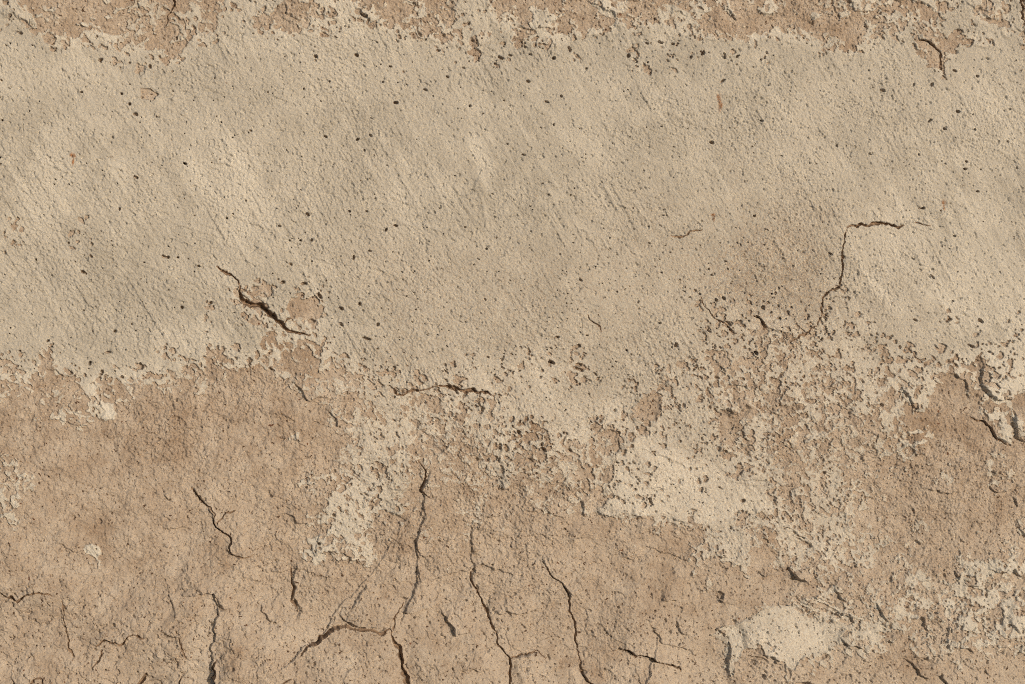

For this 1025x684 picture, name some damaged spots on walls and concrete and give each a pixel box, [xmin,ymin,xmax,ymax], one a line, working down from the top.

peeling [0,0,1025,81]
crack [216,266,311,336]
crack [790,222,931,342]
crack [393,385,494,397]
peeling [0,266,1025,684]
crack [191,487,251,559]
crack [0,592,144,668]
crack [290,566,298,611]
crack [283,602,410,684]
crack [469,570,546,684]
crack [545,566,593,684]
crack [611,648,682,672]